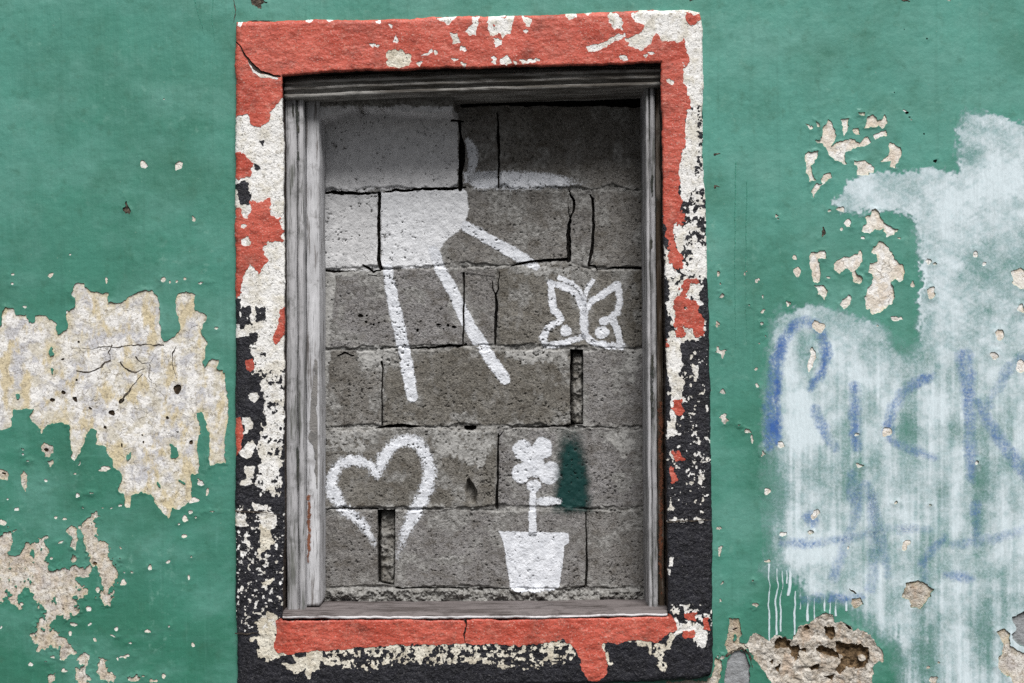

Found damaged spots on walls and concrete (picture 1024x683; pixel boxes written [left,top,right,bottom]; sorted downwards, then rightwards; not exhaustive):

crack [249,64,278,79]
peeling [369,20,438,68]
peeling [436,15,540,68]
peeling [805,112,902,198]
peeling [586,10,766,524]
peeling [792,206,935,327]
peeling [235,98,576,679]
peeling [0,277,229,683]
spalling [629,599,884,683]
peeling [997,611,1024,683]